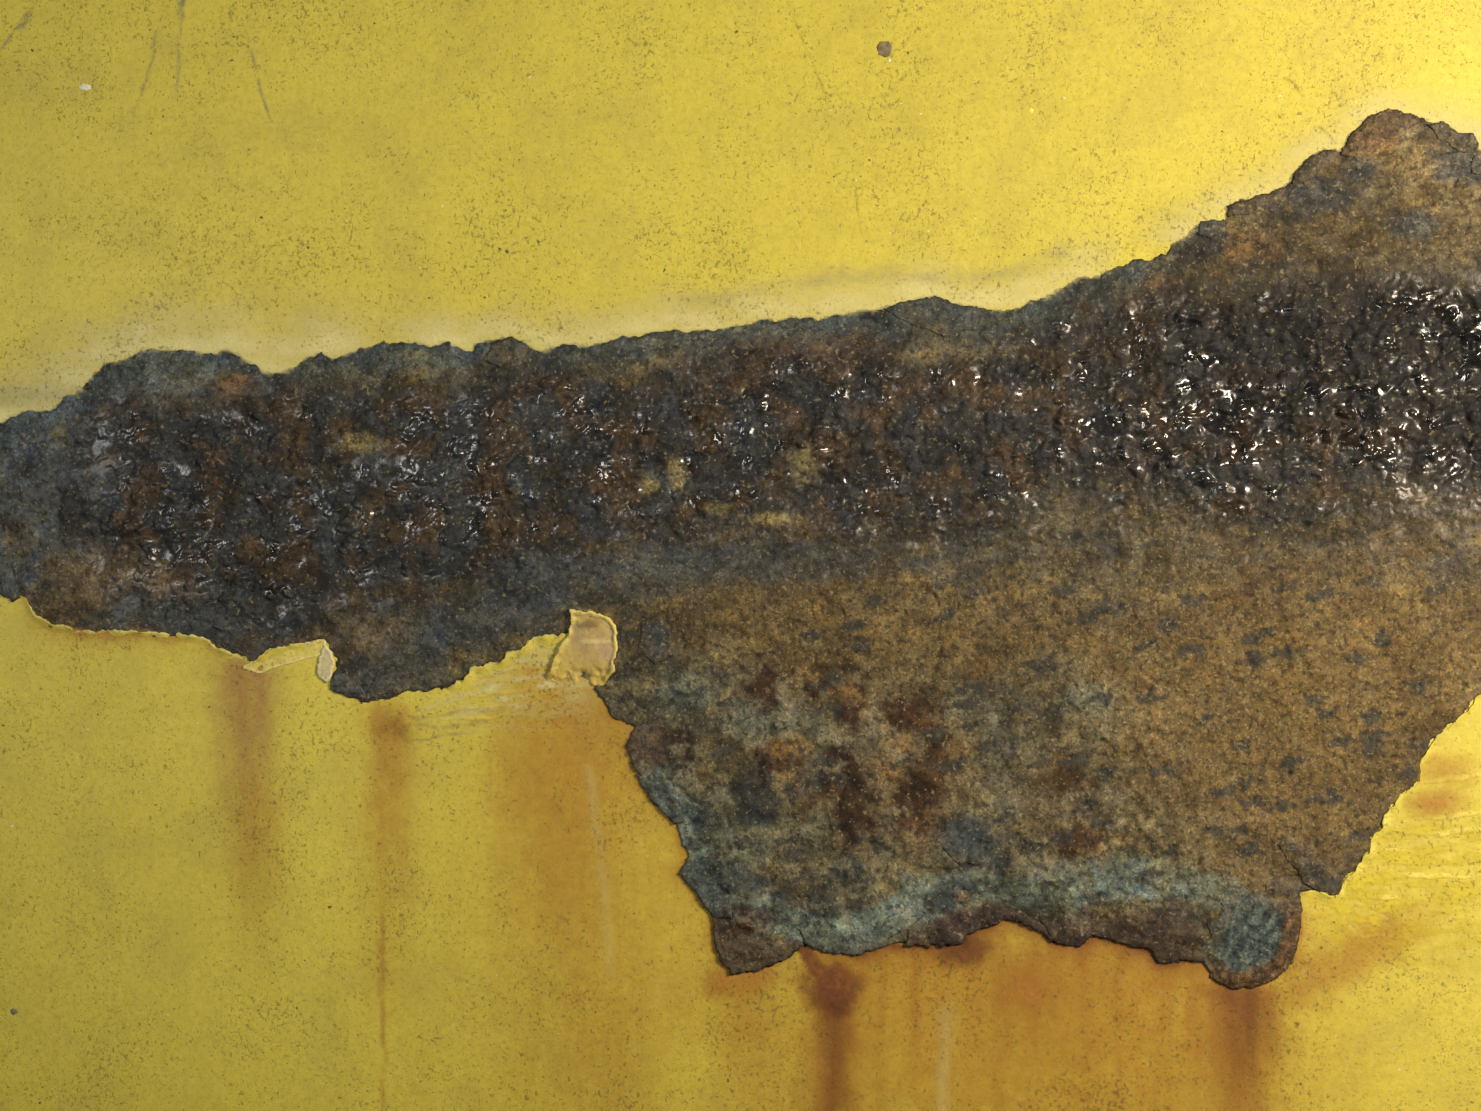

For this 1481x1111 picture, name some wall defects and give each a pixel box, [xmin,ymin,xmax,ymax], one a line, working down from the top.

rust [0,108,1481,994]
peeling [448,609,618,694]
rust [798,944,858,1111]